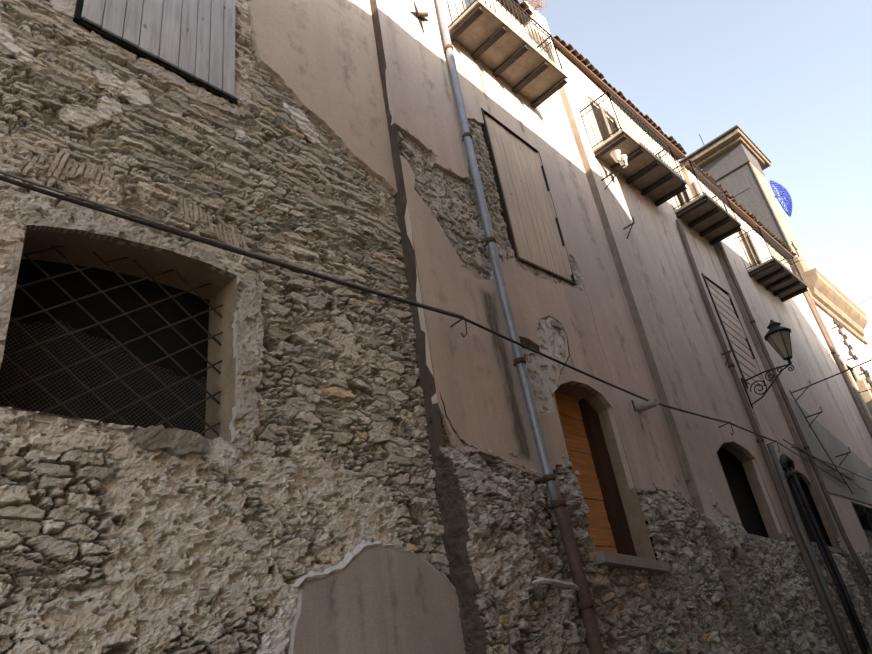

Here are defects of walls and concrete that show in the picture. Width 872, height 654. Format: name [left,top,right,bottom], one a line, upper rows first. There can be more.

spalling [396,120,584,290]
spalling [513,317,567,415]